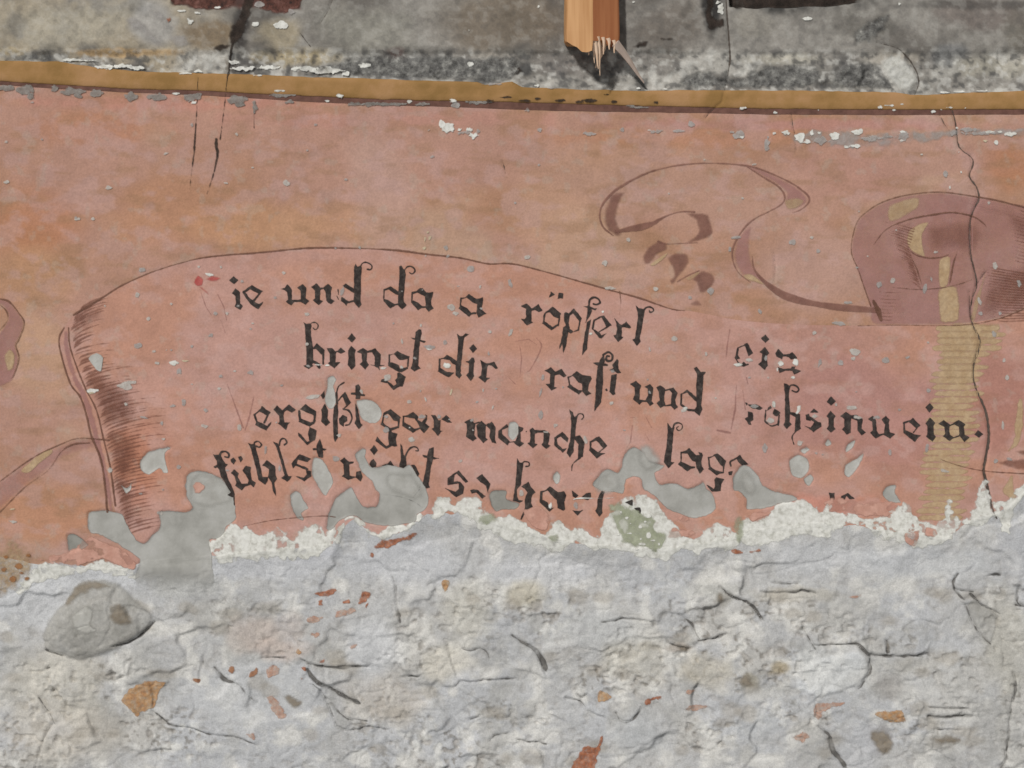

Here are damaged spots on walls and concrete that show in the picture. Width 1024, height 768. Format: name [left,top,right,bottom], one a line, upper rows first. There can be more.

peeling [0,85,34,103]
peeling [124,91,201,104]
peeling [227,95,258,113]
peeling [439,120,480,139]
peeling [764,127,1022,151]
crack [941,111,997,519]
flaking render [0,438,1024,768]
crack [724,590,762,618]
crack [512,635,548,671]
crack [808,637,919,687]
crack [306,663,367,721]
crack [824,731,846,767]